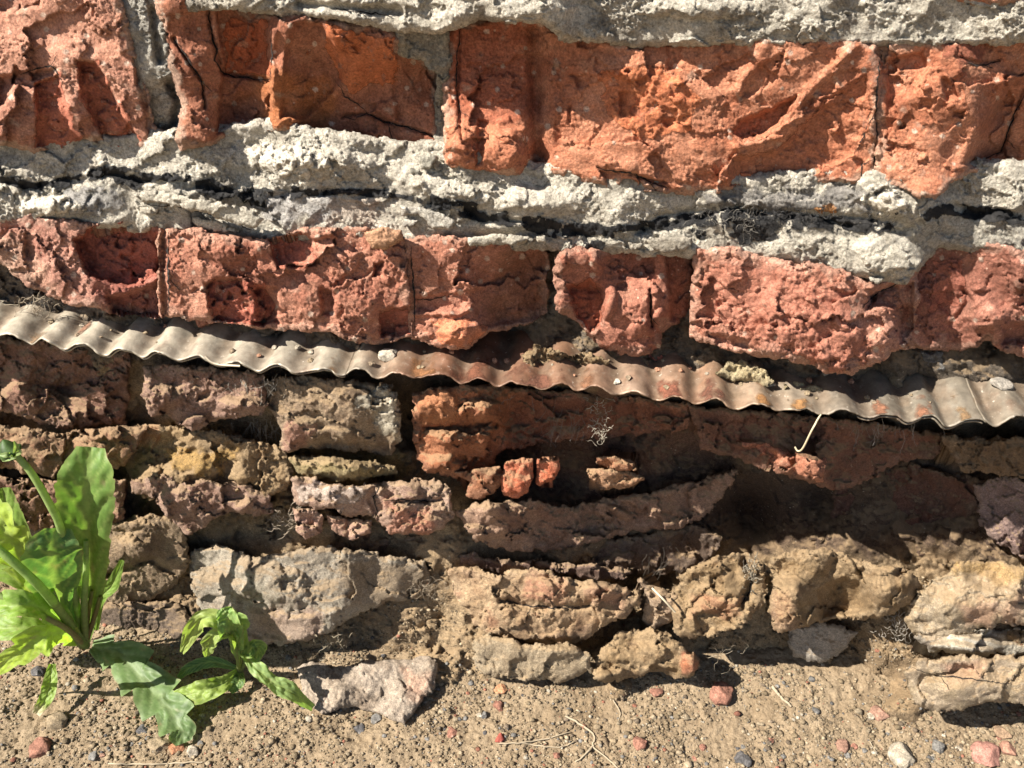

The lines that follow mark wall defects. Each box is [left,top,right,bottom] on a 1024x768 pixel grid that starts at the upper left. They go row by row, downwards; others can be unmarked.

crack [331,8,392,17]
crack [173,10,273,104]
spalling [410,118,530,175]
spalling [597,63,701,140]
spalling [726,77,871,187]
crack [857,54,882,176]
crack [597,167,667,189]
peeling [467,234,546,246]
spalling [707,261,852,348]
corrosion [657,380,682,398]
corrosion [791,399,807,409]
corrosion [873,400,887,414]